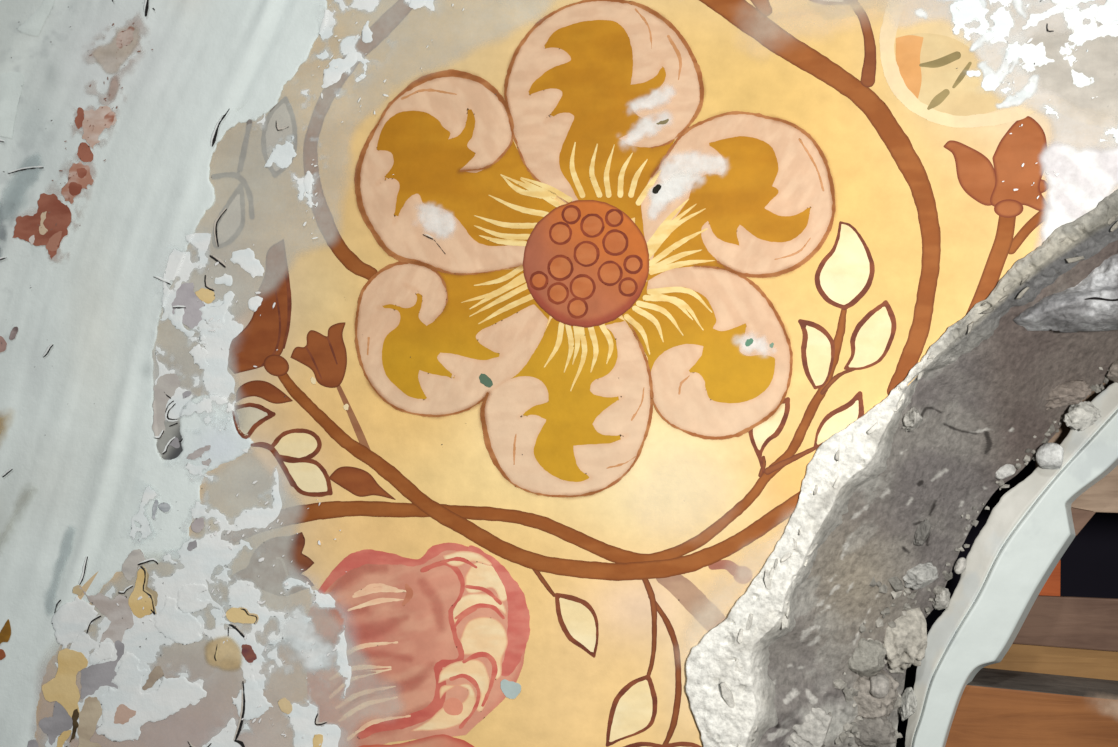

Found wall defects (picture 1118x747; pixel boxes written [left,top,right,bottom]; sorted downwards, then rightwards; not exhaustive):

peeling [322,21,373,88]
peeling [1022,0,1118,115]
peeling [13,26,139,259]
peeling [264,141,297,168]
peeling [0,327,18,352]
peeling [168,248,264,370]
peeling [152,373,191,438]
peeling [187,445,211,466]
spalling [685,189,1118,747]
peeling [187,518,204,551]
peeling [27,549,292,747]
peeling [313,734,323,747]